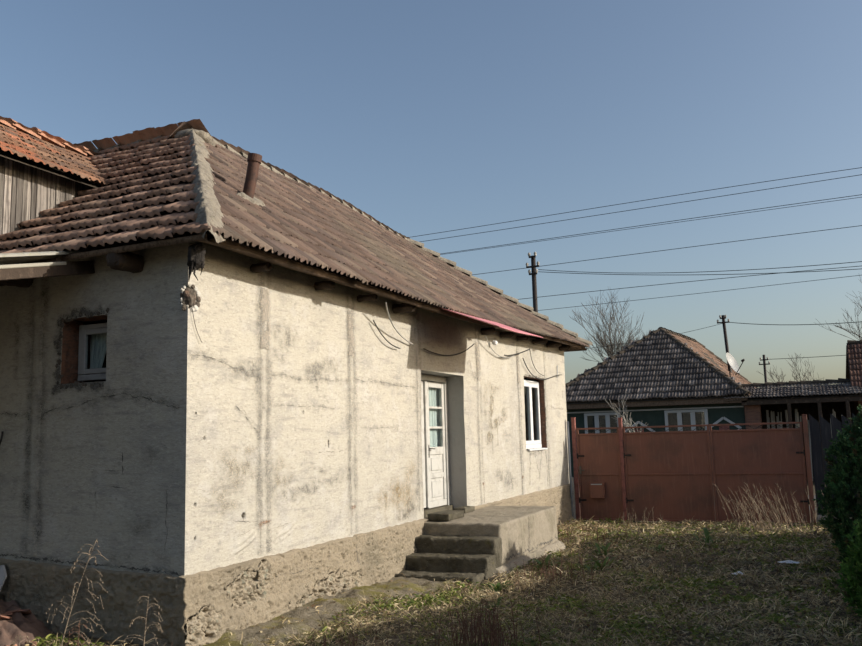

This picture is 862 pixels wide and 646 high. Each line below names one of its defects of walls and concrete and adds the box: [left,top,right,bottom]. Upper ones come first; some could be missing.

spalling [224,560,271,611]
spalling [180,606,222,646]